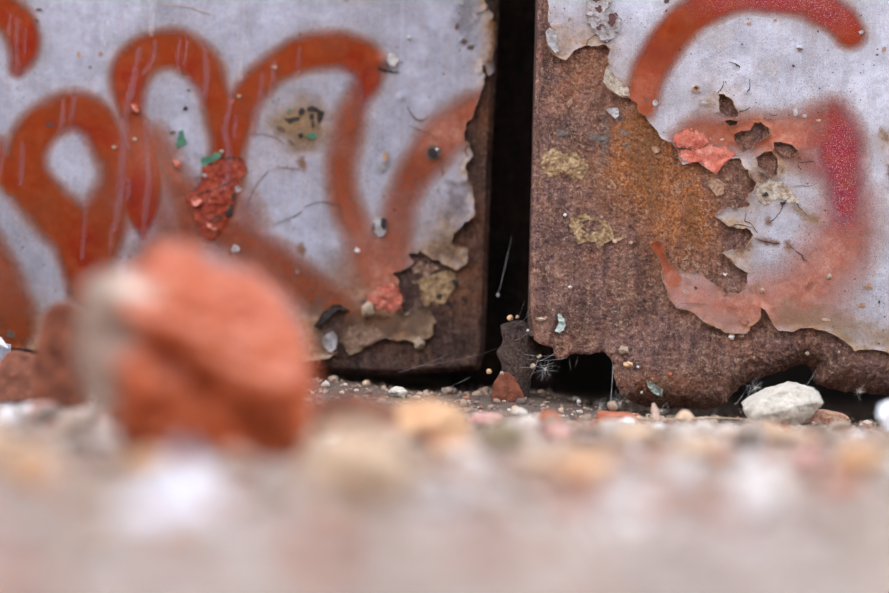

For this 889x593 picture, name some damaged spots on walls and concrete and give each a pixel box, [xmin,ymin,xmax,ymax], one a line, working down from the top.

peeling [6,330,35,354]
peeling [310,0,499,375]
peeling [529,0,889,410]